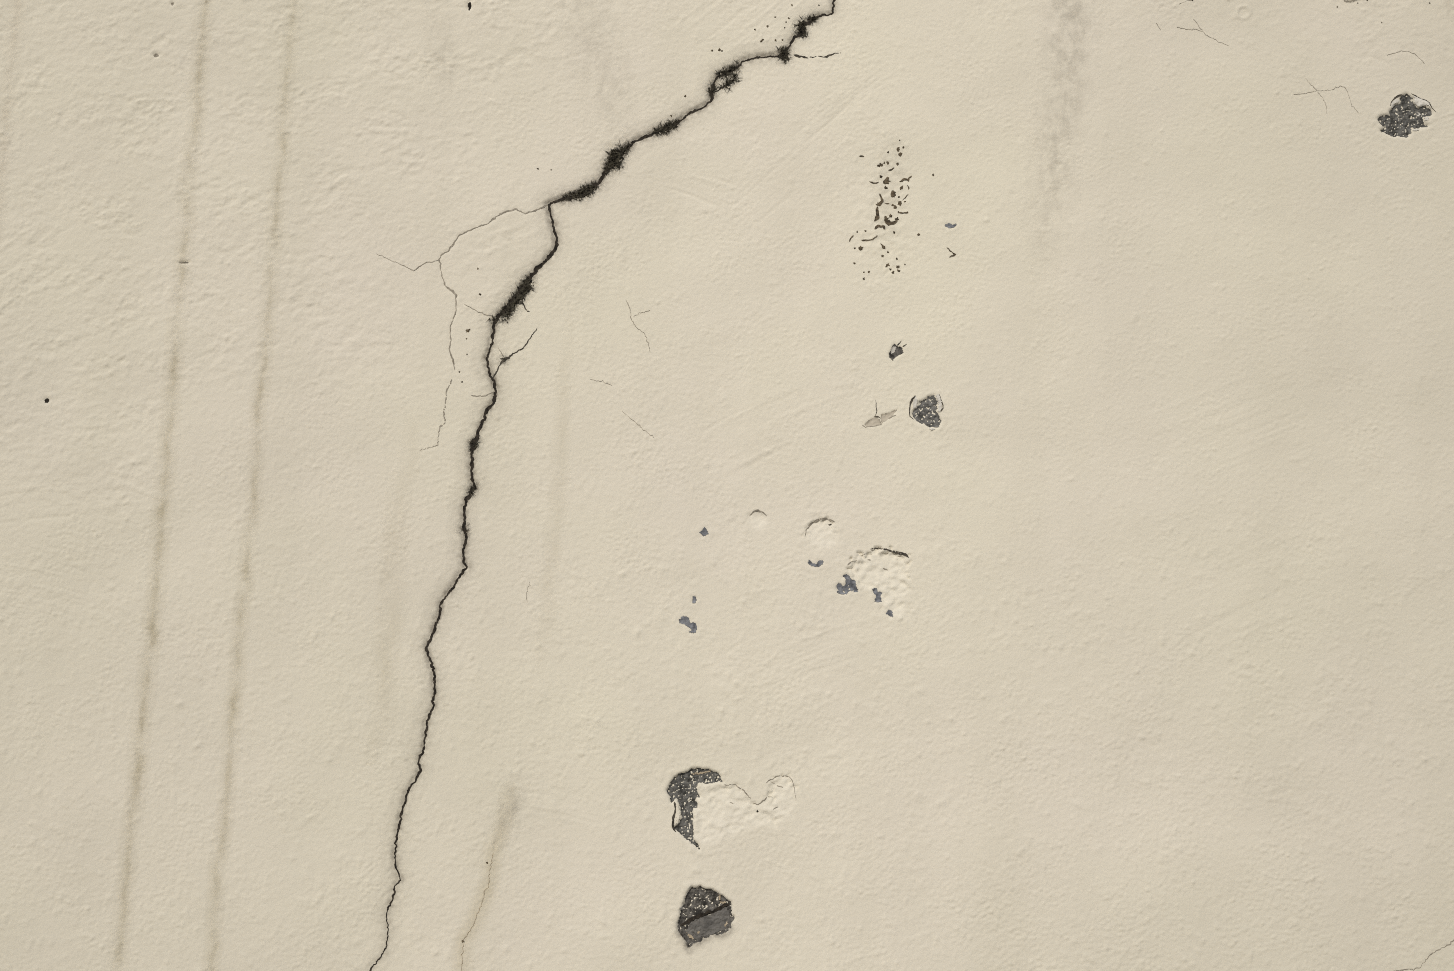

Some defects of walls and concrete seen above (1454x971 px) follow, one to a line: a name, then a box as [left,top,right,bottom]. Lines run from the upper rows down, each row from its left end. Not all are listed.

spalling [1377,93,1436,138]
spalling [863,394,943,430]
crack [369,0,835,971]
spalling [808,538,919,631]
spalling [667,766,805,858]
spalling [678,886,734,947]